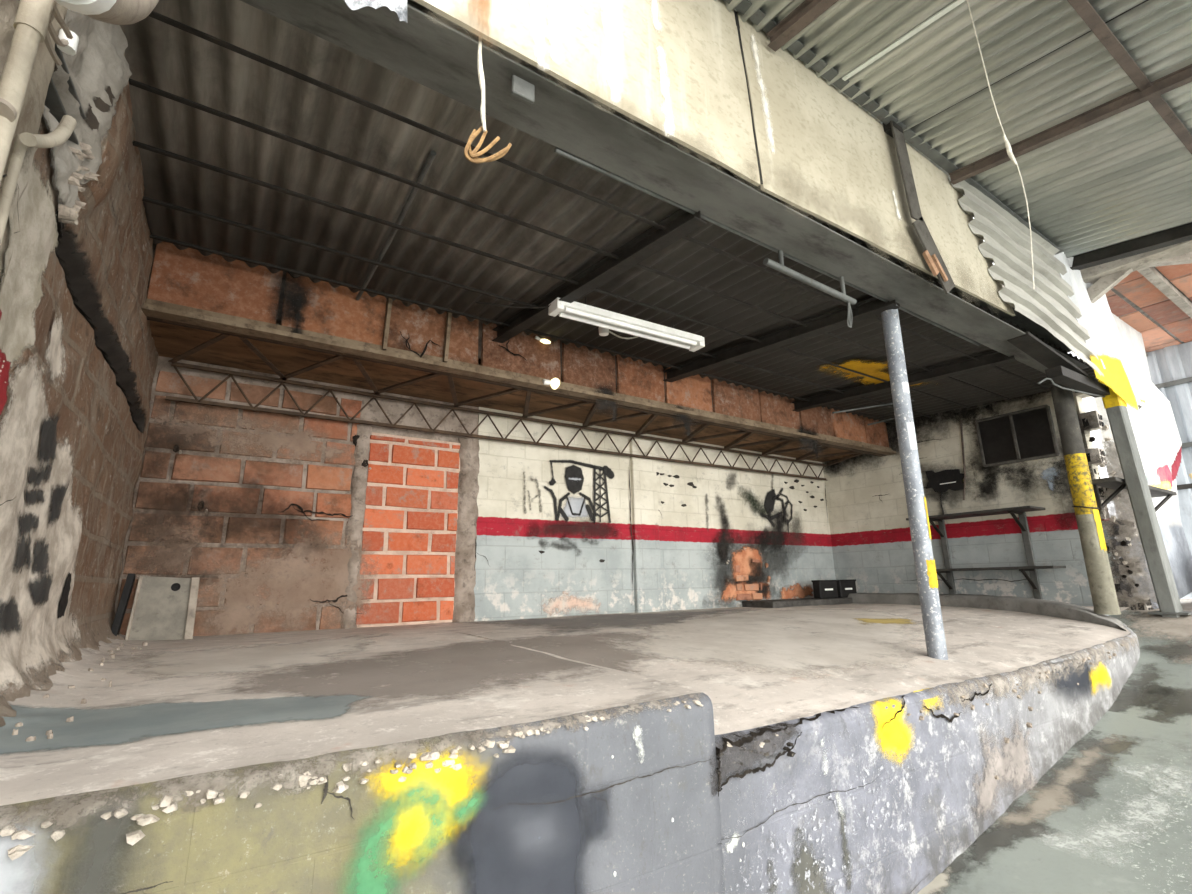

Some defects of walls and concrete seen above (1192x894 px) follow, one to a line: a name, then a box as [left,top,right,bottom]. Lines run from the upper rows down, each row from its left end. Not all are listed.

peeling [0,0,132,696]
peeling [542,592,601,616]
spalling [721,546,813,601]
crack [732,707,860,737]
crack [882,684,992,729]
water stain [1108,643,1192,723]
spalling [710,722,802,797]
water stain [1038,730,1136,803]
water stain [792,828,834,894]
water stain [840,814,851,889]
water stain [933,800,1052,894]